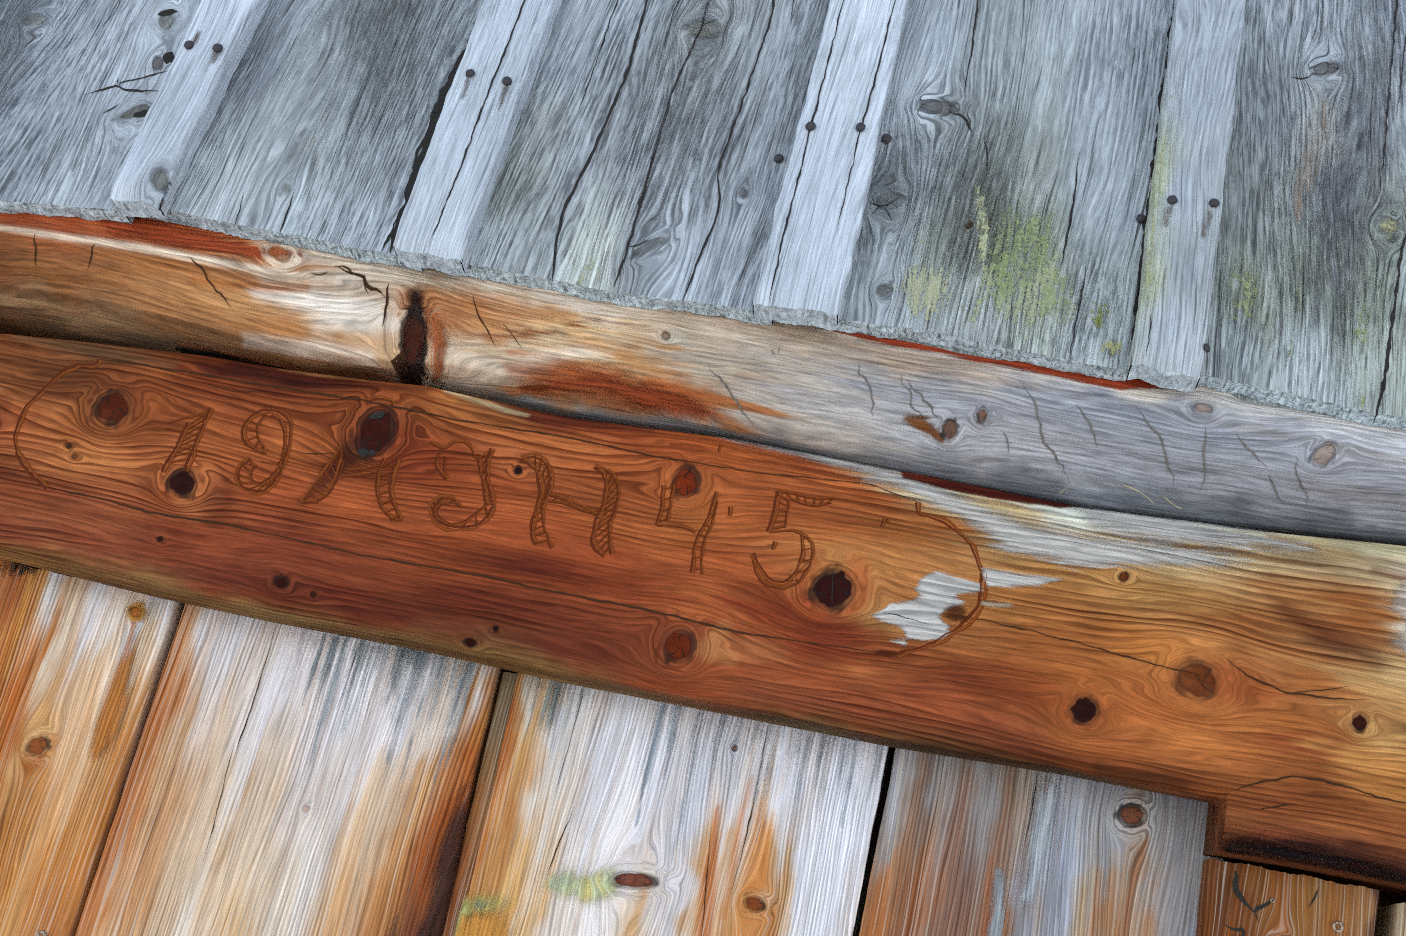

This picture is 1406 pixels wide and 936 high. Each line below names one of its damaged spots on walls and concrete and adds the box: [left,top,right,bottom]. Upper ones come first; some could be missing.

crack [552,0,716,286]
crack [683,0,794,299]
crack [969,617,1367,700]